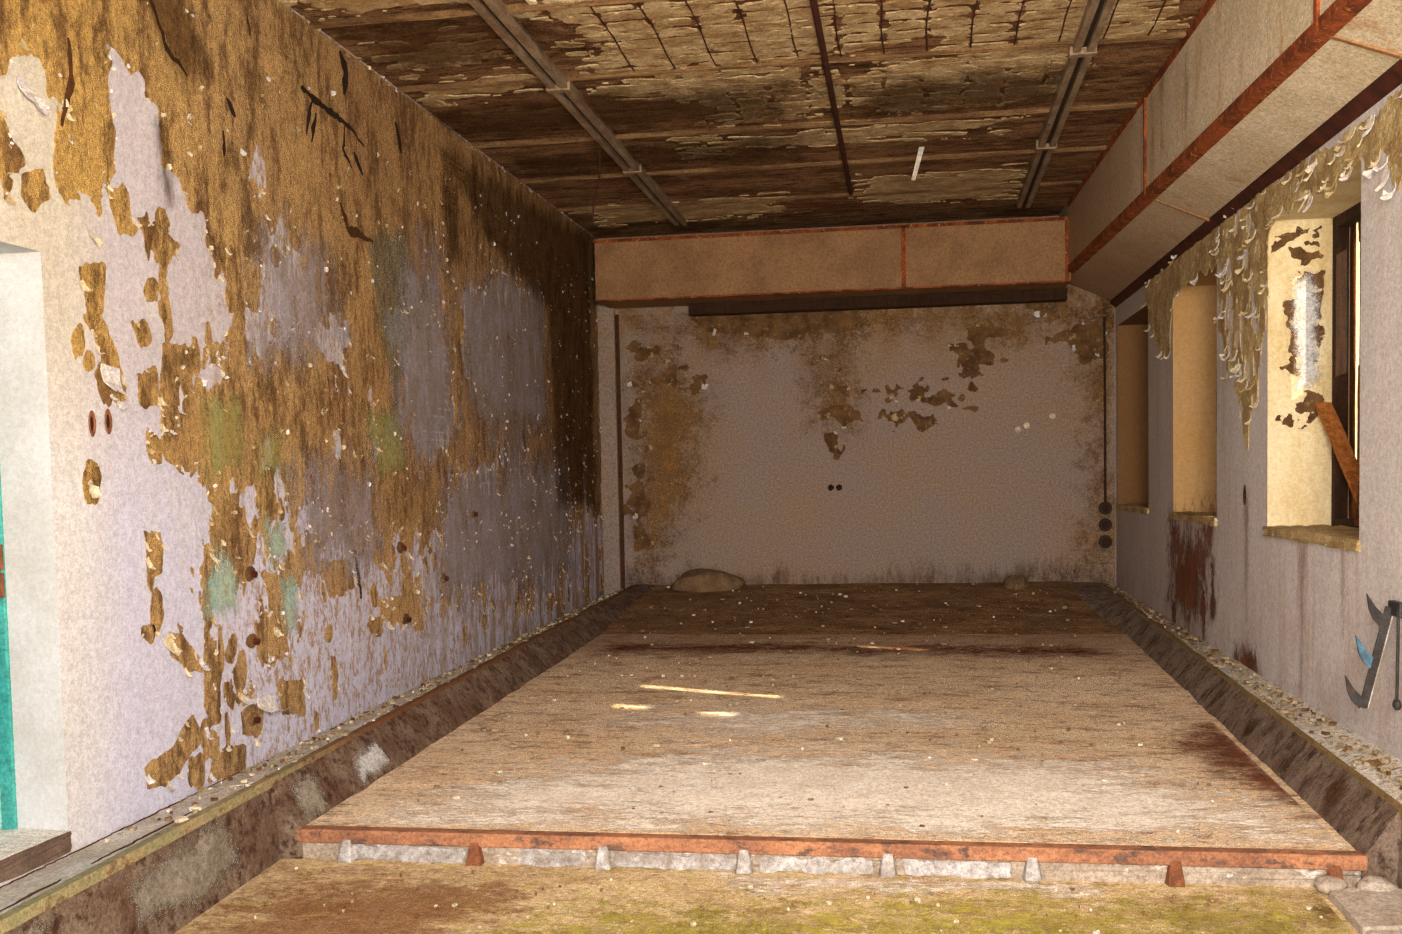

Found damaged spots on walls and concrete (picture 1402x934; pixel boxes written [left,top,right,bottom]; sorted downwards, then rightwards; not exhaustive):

spalling [510,0,1088,128]
water stain [843,69,1063,118]
spalling [1100,0,1190,39]
peeling [0,0,605,792]
peeling [623,340,708,552]
peeling [688,310,1009,460]
peeling [1026,300,1109,374]
peeling [1141,89,1402,452]
corrosion [1167,497,1216,641]